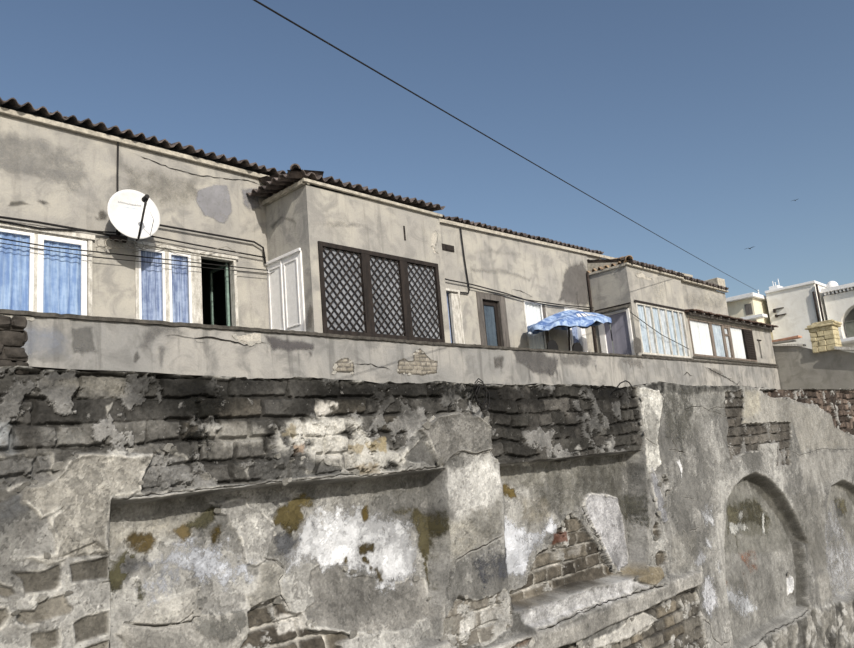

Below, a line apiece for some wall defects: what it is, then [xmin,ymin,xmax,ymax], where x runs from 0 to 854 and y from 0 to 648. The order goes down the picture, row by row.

crack [167,335,264,347]
spalling [725,390,792,467]
crack [110,450,489,515]
spalling [0,348,670,648]
leakage [137,531,252,602]
crack [540,584,668,630]